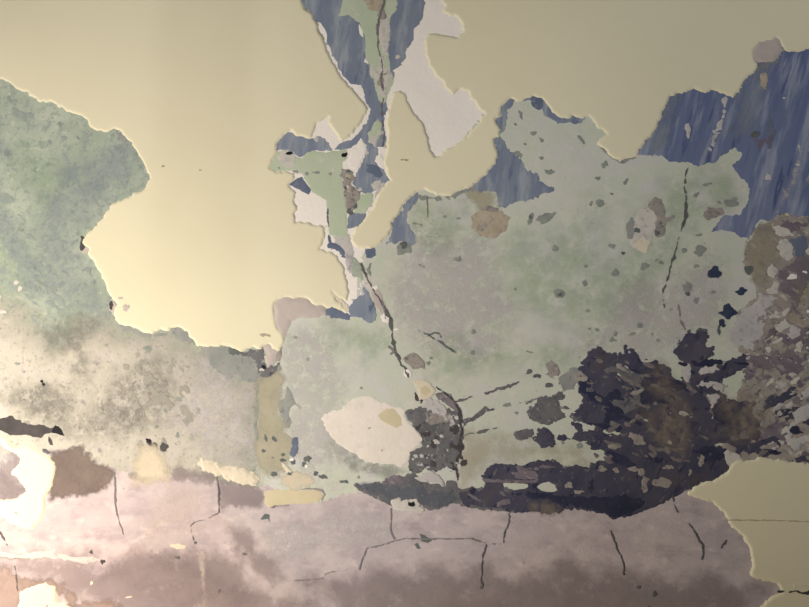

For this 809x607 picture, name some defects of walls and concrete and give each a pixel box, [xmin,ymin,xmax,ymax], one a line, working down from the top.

peeling [0,79,263,489]
crack [360,263,411,378]
peeling [269,0,809,520]
crack [662,168,688,330]
water stain [133,445,169,484]
water stain [253,372,328,479]
flaking render [0,443,781,607]
crack [295,508,510,587]